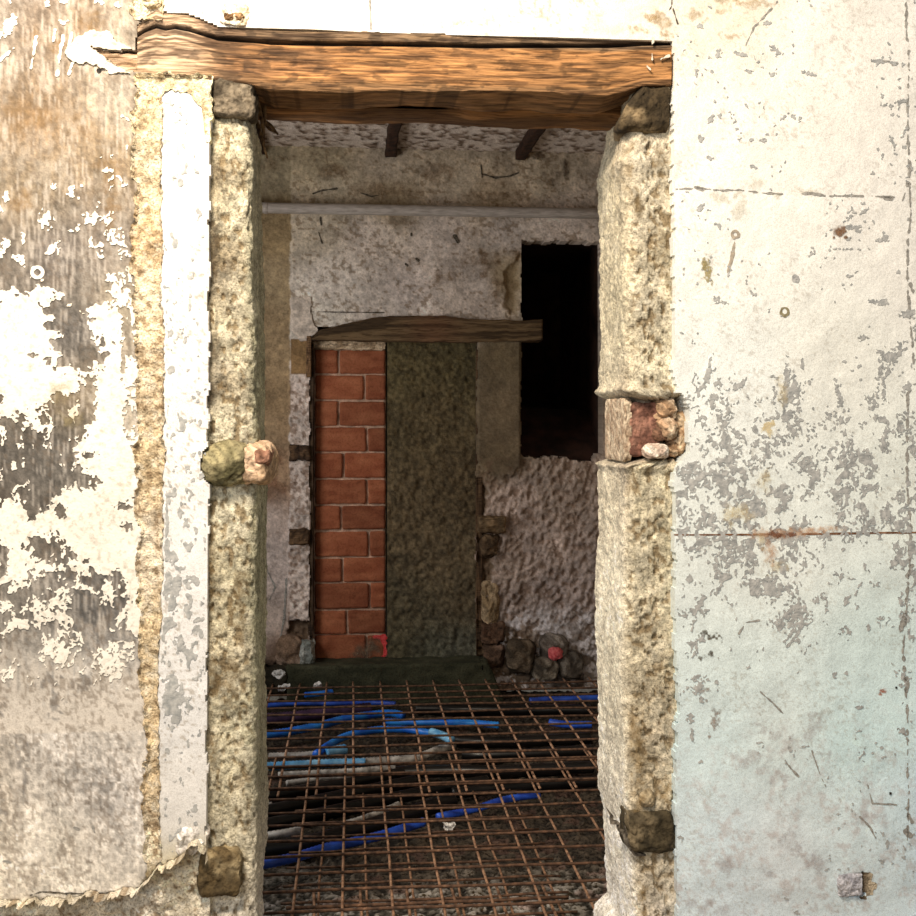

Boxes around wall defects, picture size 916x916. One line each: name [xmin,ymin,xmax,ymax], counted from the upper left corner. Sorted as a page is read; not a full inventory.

peeling [2,0,18,38]
peeling [808,193,889,268]
peeling [0,71,215,916]
peeling [605,309,916,658]
corrosion [754,527,837,556]
peeling [679,674,719,703]